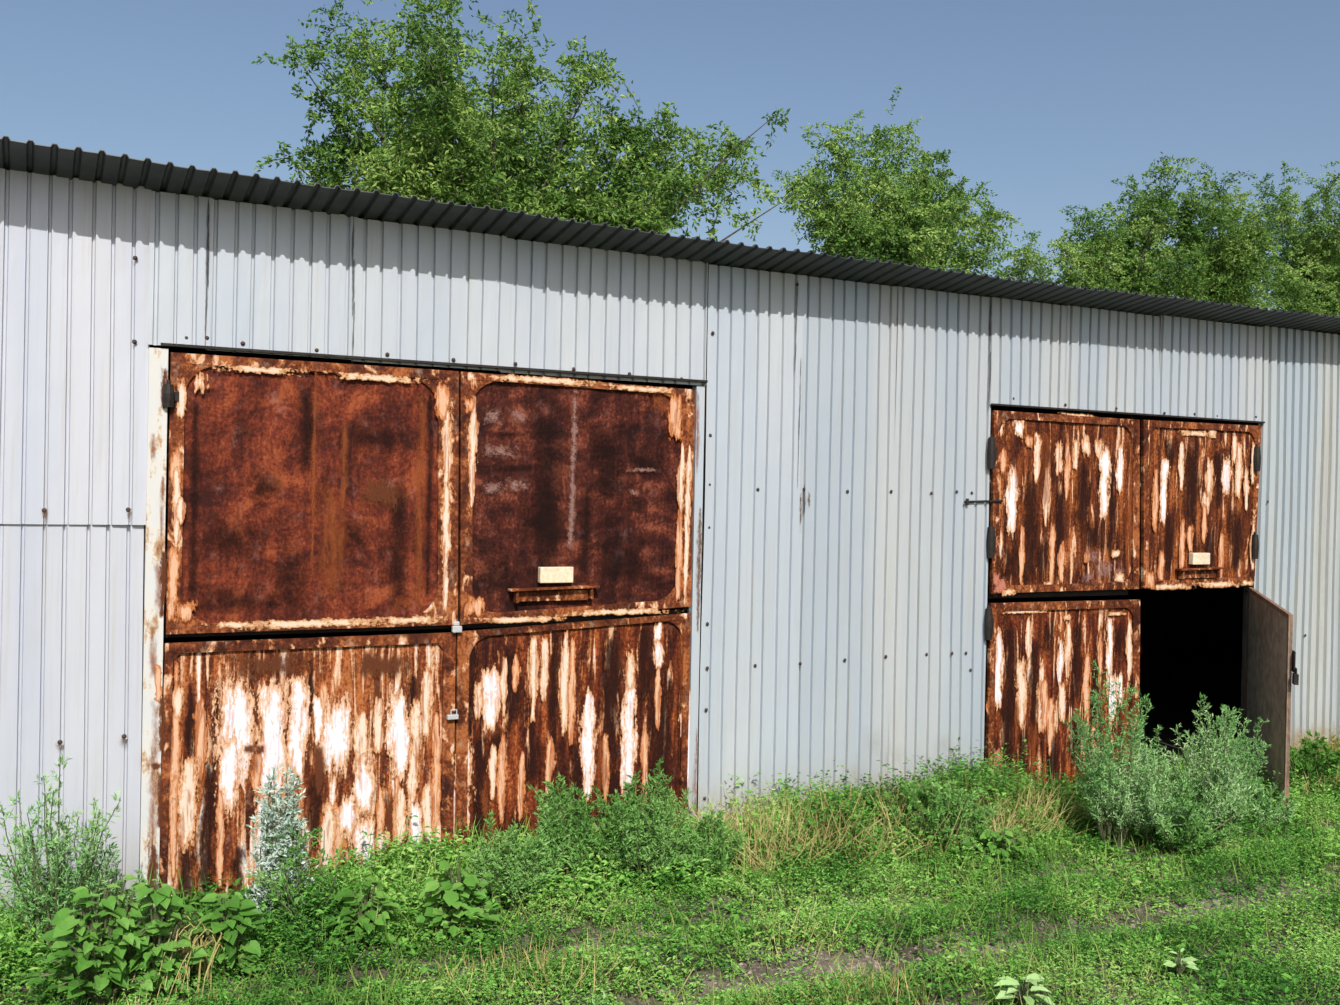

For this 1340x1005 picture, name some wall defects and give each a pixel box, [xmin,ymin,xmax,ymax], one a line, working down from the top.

rust [147,654,165,889]
rust [176,686,218,901]
rust [285,747,326,850]
peeling [167,363,692,898]
rust [474,647,524,838]
rust [525,630,591,825]
rust [638,627,683,793]
rust [1000,619,1103,781]
peeling [986,419,1133,766]
rust [1000,437,1133,584]
peeling [1143,430,1255,590]
rust [1164,436,1244,571]